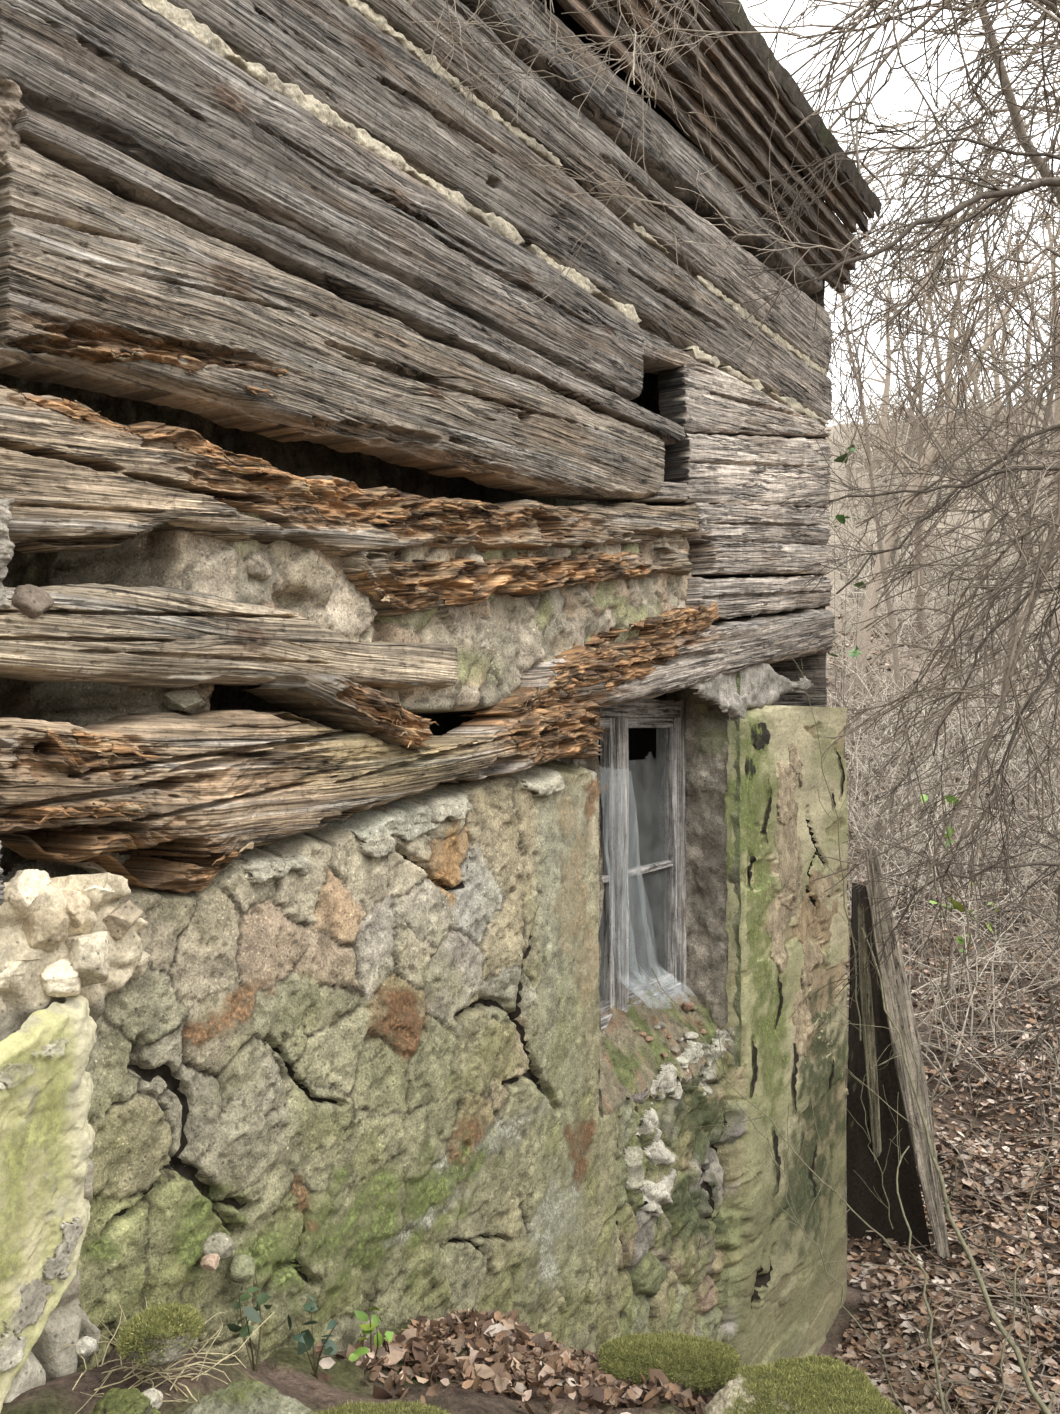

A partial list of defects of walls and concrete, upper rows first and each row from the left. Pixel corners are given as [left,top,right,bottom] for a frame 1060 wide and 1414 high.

damp [724,715,762,878]
crack [748,778,772,890]
damp [15,1054,72,1192]
flaking render [0,869,143,997]
flaking render [129,951,150,980]
crack [113,1064,247,1226]
crack [264,1040,338,1104]
crack [455,932,545,1096]
spalling [623,1029,734,1217]
crack [700,976,835,1223]
crack [447,1235,504,1251]
crack [751,1260,773,1309]